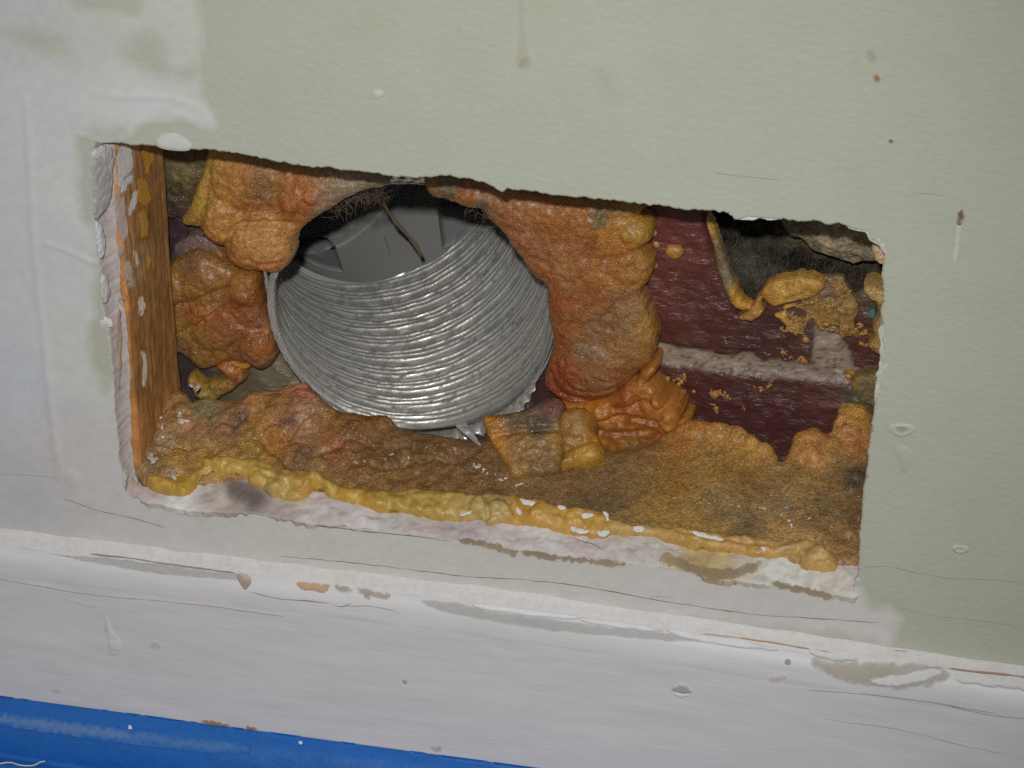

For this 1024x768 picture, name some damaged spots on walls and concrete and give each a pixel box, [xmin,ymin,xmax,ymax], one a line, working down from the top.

peeling [236,573,251,589]
peeling [297,582,390,599]
crack [281,556,876,623]
peeling [472,603,778,651]
peeling [809,651,1024,691]